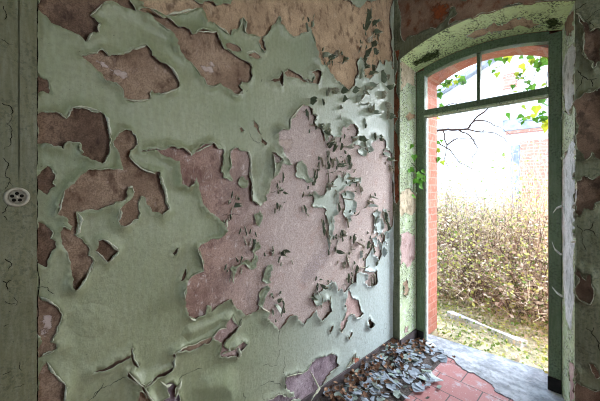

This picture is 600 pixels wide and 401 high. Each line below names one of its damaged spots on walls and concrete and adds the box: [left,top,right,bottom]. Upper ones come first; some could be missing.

crack [2,103,13,189]
peeling [37,0,546,359]
peeling [552,10,600,329]
peeling [268,353,359,401]
peeling [567,360,600,401]